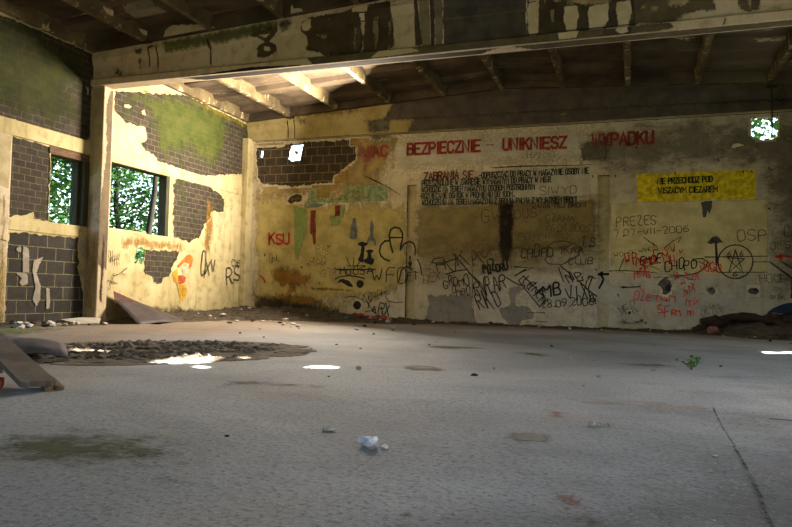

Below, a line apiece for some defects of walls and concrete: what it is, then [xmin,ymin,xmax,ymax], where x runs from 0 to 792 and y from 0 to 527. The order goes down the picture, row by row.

peeling [164,24,215,37]
leakage [164,21,278,65]
peeling [195,26,301,76]
peeling [371,48,419,58]
peeling [558,31,579,40]
spalling [0,14,104,176]
spalling [0,134,51,222]
spalling [114,90,248,244]
spalling [255,139,357,204]
spalling [4,231,84,323]
spalling [143,249,180,285]
crack [713,408,775,527]